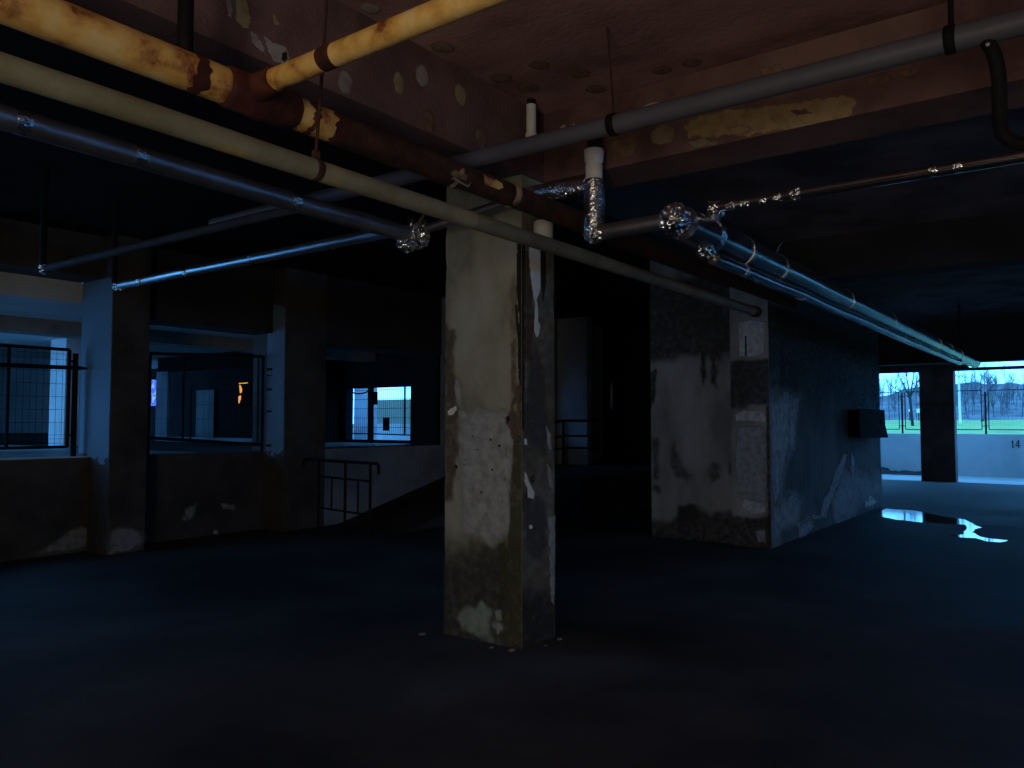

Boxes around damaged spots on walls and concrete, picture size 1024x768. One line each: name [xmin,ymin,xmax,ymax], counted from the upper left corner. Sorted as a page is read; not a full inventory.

corrosion [180,52,213,95]
flaking render [650,95,857,148]
corrosion [301,101,584,234]
corrosion [604,234,799,309]
damp [652,393,883,549]